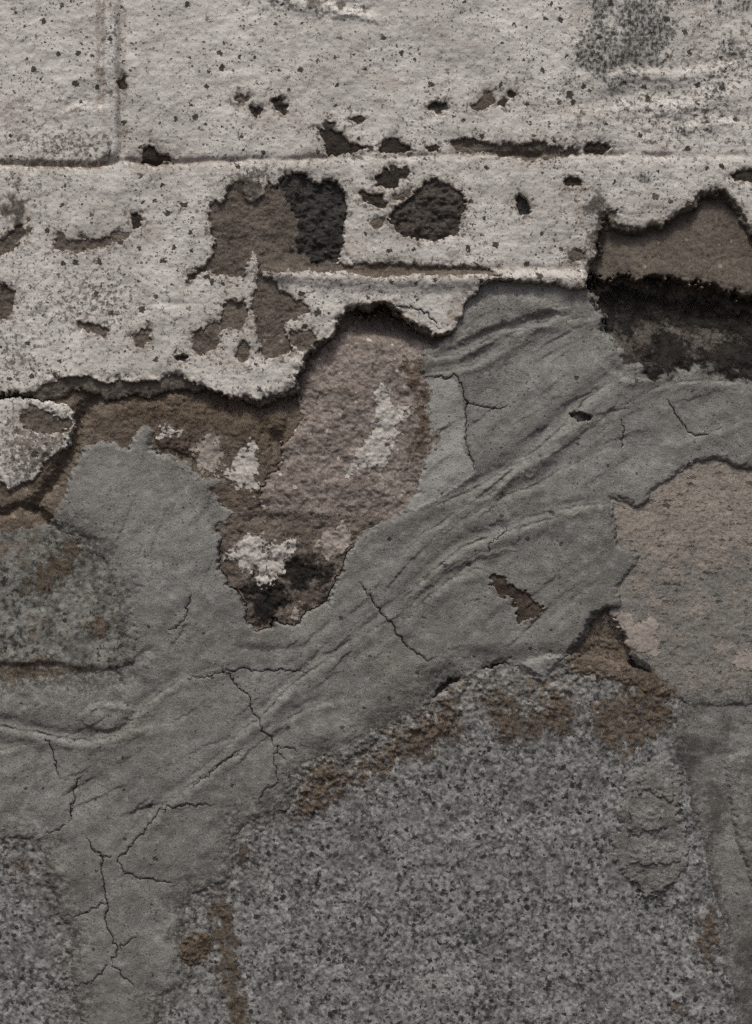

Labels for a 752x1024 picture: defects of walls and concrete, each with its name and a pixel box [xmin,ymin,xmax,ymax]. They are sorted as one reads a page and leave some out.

flaking render [317,128,466,242]
peeling [731,170,752,183]
peeling [0,284,15,320]
peeling [54,214,143,254]
peeling [186,173,502,362]
water stain [632,328,752,383]
peeling [20,405,73,434]
crack [433,373,506,465]
spalling [215,507,383,631]
crack [363,586,437,660]
spalling [489,574,543,624]
crack [45,667,297,987]